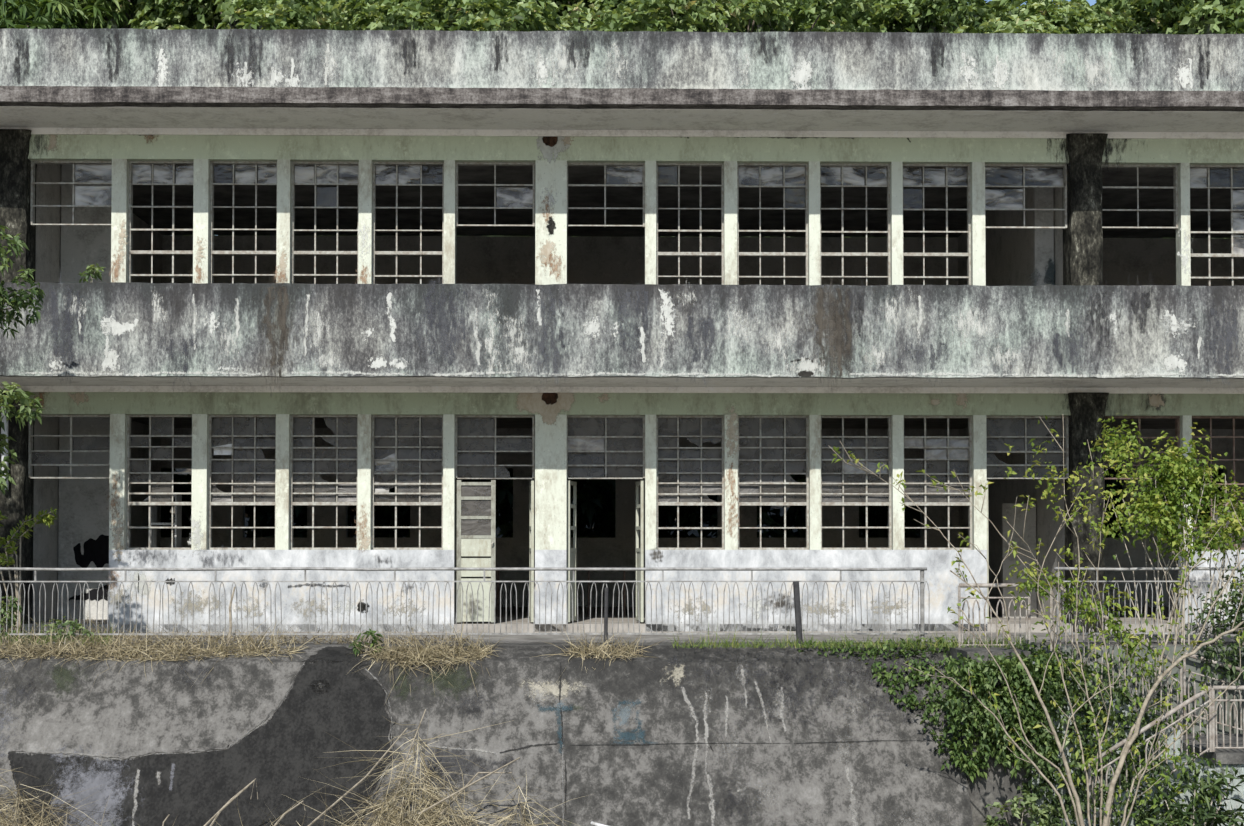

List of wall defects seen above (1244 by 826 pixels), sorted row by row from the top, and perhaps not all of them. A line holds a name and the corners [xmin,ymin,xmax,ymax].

leakage [5,40,29,83]
leakage [221,28,264,86]
leakage [931,35,953,76]
leakage [1199,38,1210,89]
spalling [536,136,574,162]
corrosion [112,220,128,282]
peeling [26,294,260,377]
peeling [433,289,825,377]
peeling [850,345,1021,376]
spalling [516,393,575,425]
leakage [660,656,928,826]
leakage [51,749,140,826]